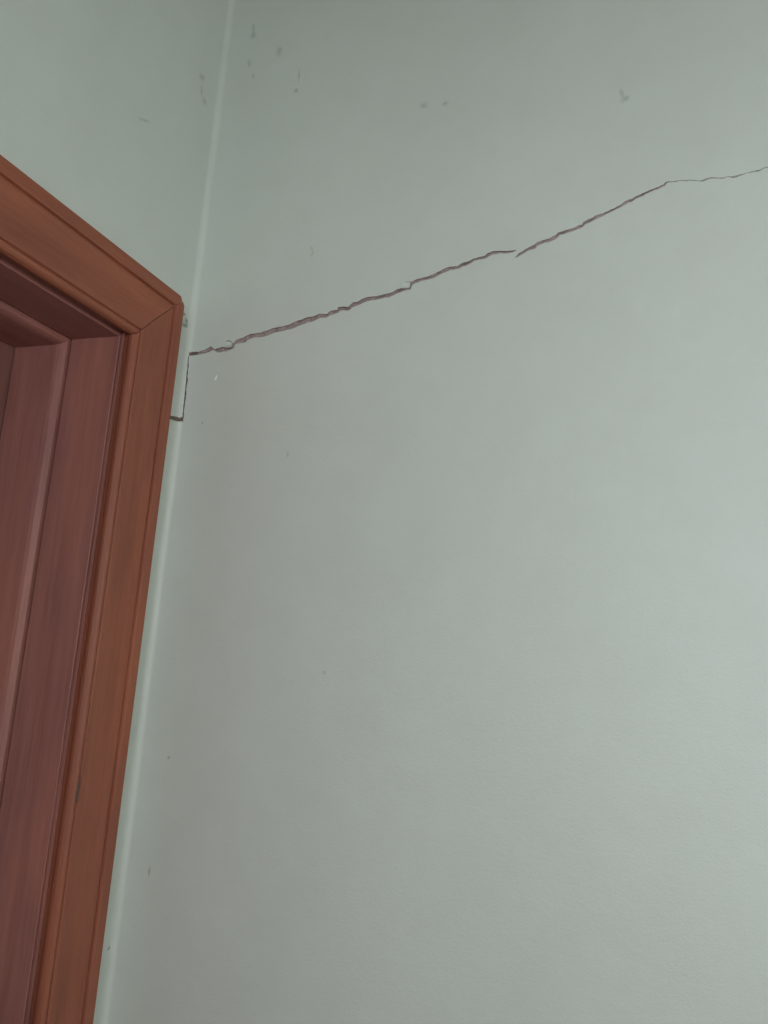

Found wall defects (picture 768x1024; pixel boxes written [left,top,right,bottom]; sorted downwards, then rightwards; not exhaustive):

crack [170,167,768,421]